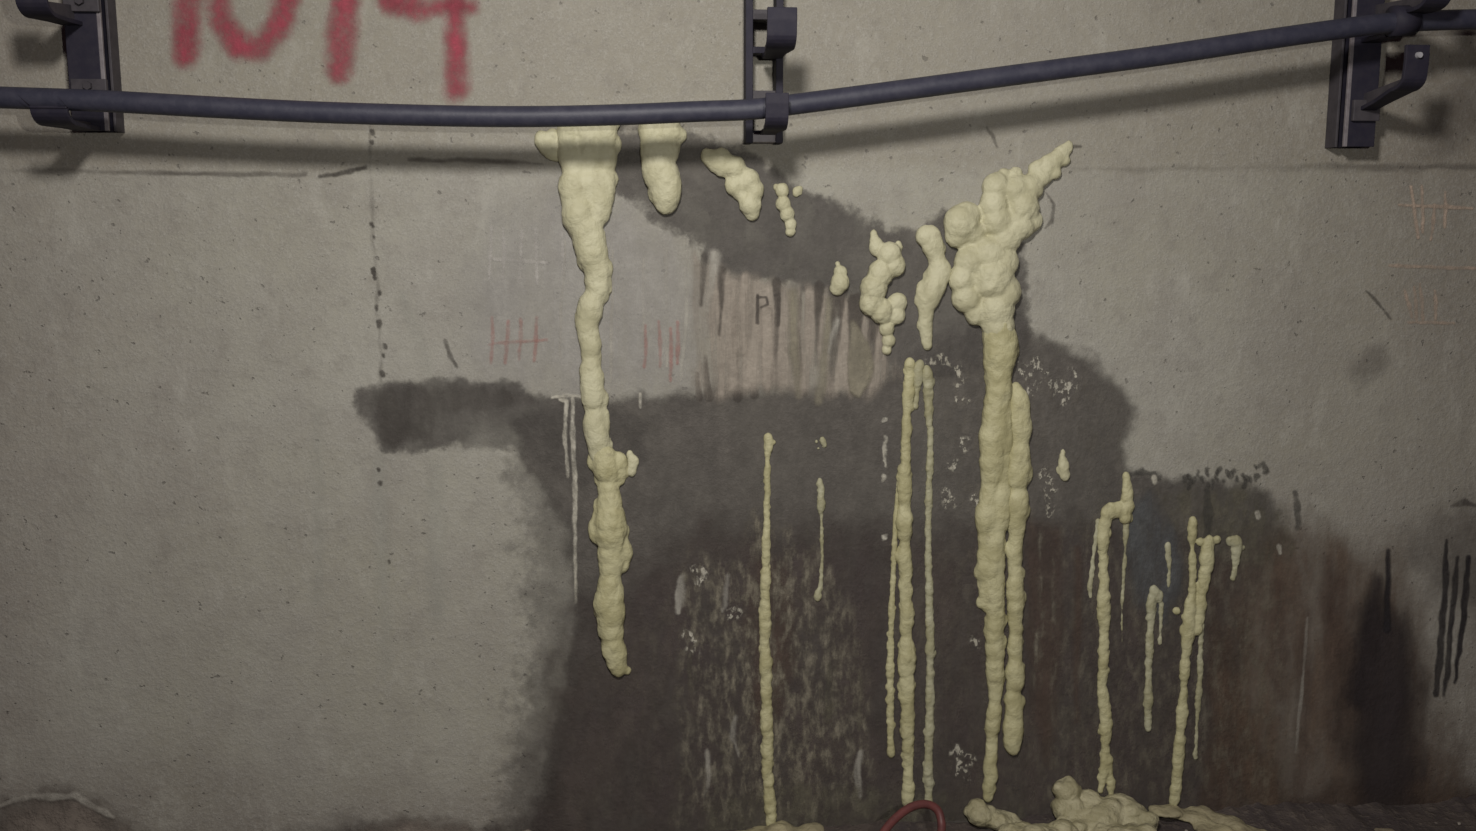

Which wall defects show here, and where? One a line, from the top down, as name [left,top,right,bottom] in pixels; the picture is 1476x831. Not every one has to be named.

damp [355,125,1415,831]
damp [1434,539,1471,696]